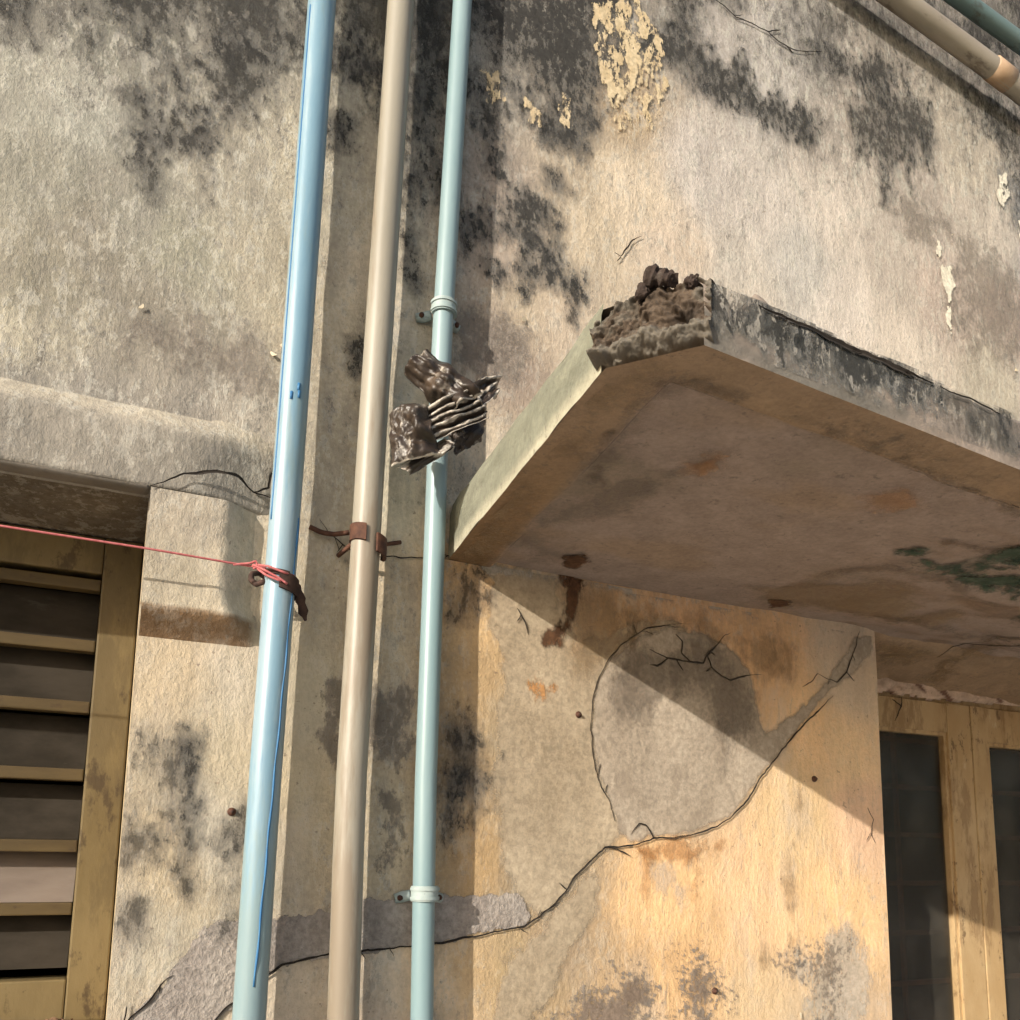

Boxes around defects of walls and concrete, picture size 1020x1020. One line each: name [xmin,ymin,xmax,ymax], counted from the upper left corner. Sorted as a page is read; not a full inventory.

damp [0,0,308,205]
damp [400,0,453,295]
peeling [557,92,573,129]
peeling [592,0,669,131]
damp [815,41,937,207]
spalling [586,263,718,375]
damp [710,283,948,412]
peeling [936,239,956,334]
crack [150,469,272,498]
rust [541,555,588,647]
crack [361,623,860,959]
crack [124,975,173,1020]